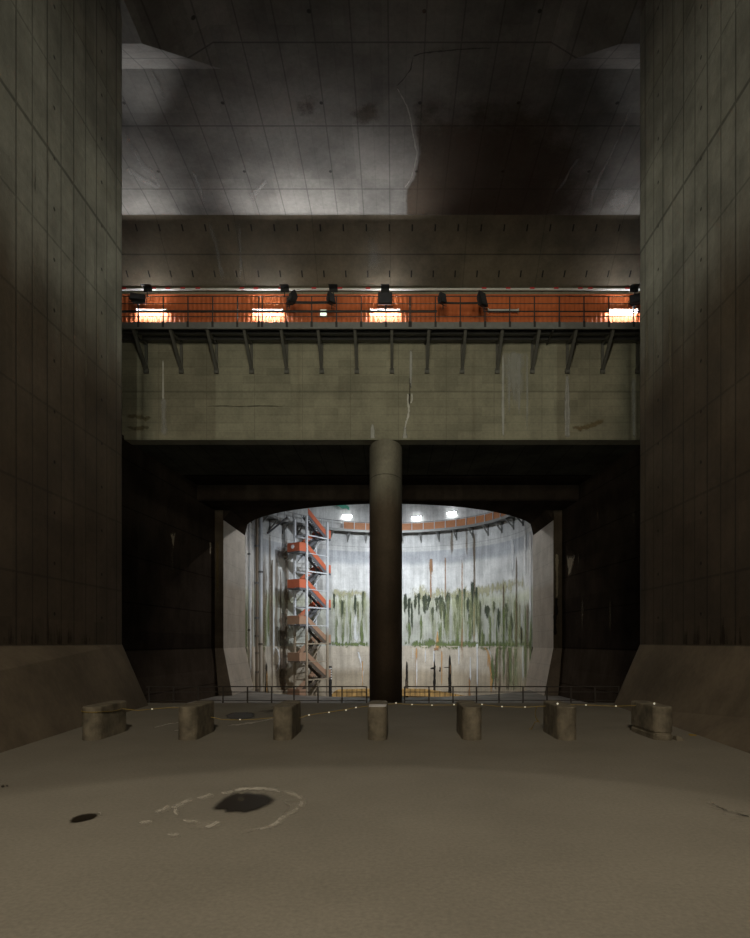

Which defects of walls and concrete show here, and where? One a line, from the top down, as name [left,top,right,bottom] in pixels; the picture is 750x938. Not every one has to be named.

crack [397,48,488,187]
crack [403,351,413,438]
damp [139,787,304,830]